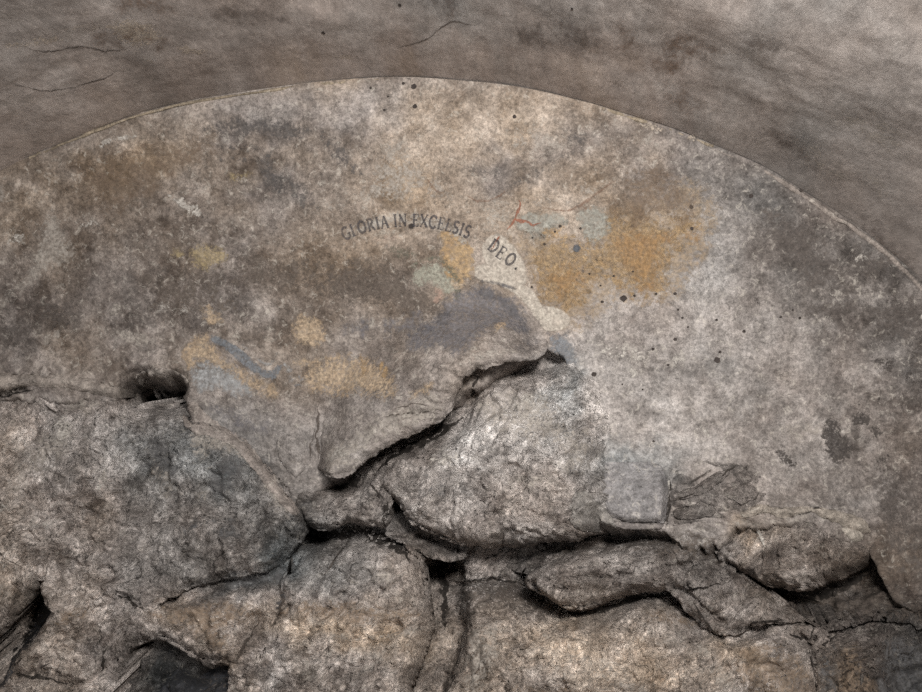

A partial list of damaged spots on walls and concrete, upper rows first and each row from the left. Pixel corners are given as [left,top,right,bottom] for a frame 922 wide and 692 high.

rust [531,168,710,313]
crack [0,389,57,414]
peeling [0,365,188,399]
crack [470,366,482,397]
crack [309,404,320,459]
crack [370,483,394,527]
crack [615,463,737,525]
crack [118,561,144,609]
crack [453,576,525,586]
crack [236,585,285,667]
crack [14,664,67,685]
crack [741,620,833,684]